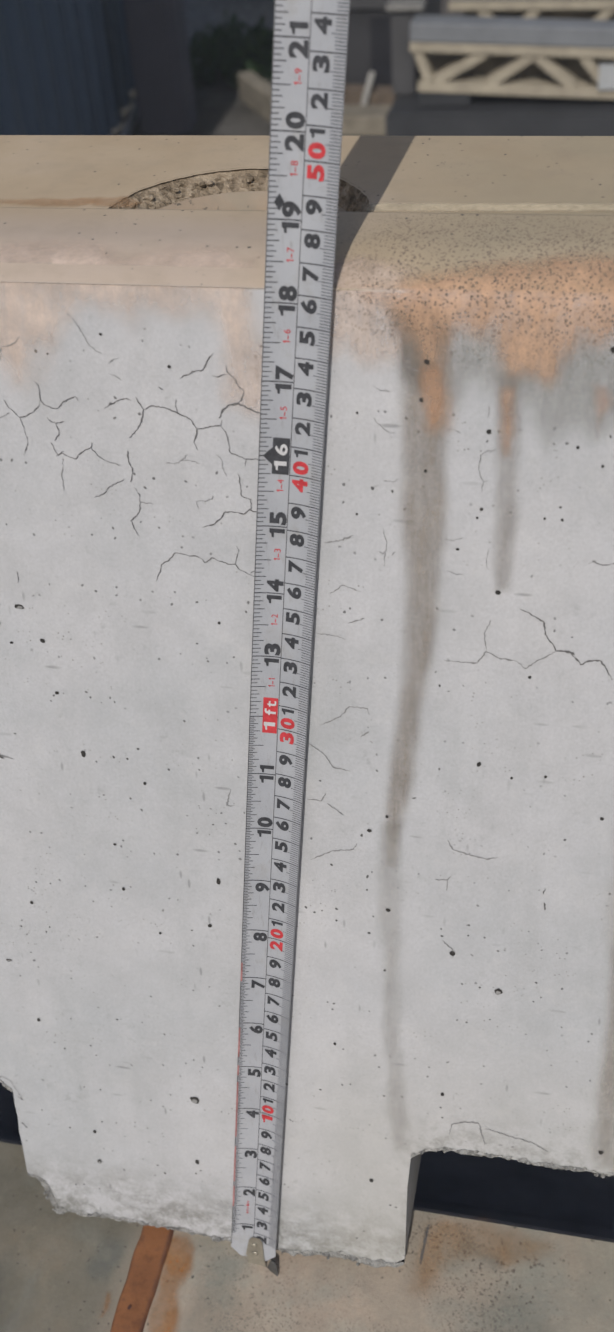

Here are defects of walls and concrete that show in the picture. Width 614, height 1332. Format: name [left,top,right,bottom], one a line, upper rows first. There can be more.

spalling [108,167,269,209]
spalling [338,177,373,212]
corrosion [396,261,614,376]
crack [2,315,260,581]
crack [445,609,613,680]